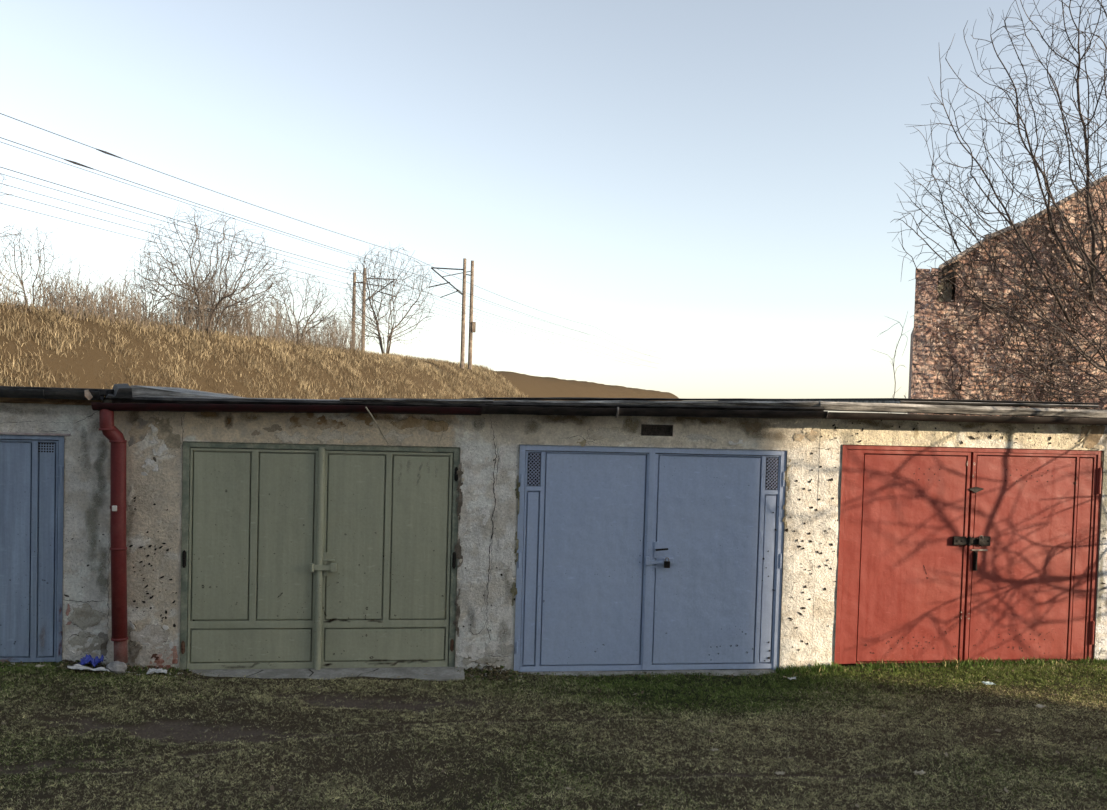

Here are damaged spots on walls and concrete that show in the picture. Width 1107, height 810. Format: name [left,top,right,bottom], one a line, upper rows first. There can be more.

flaking render [126,417,181,510]
flaking render [126,531,178,670]
crack [470,417,511,657]